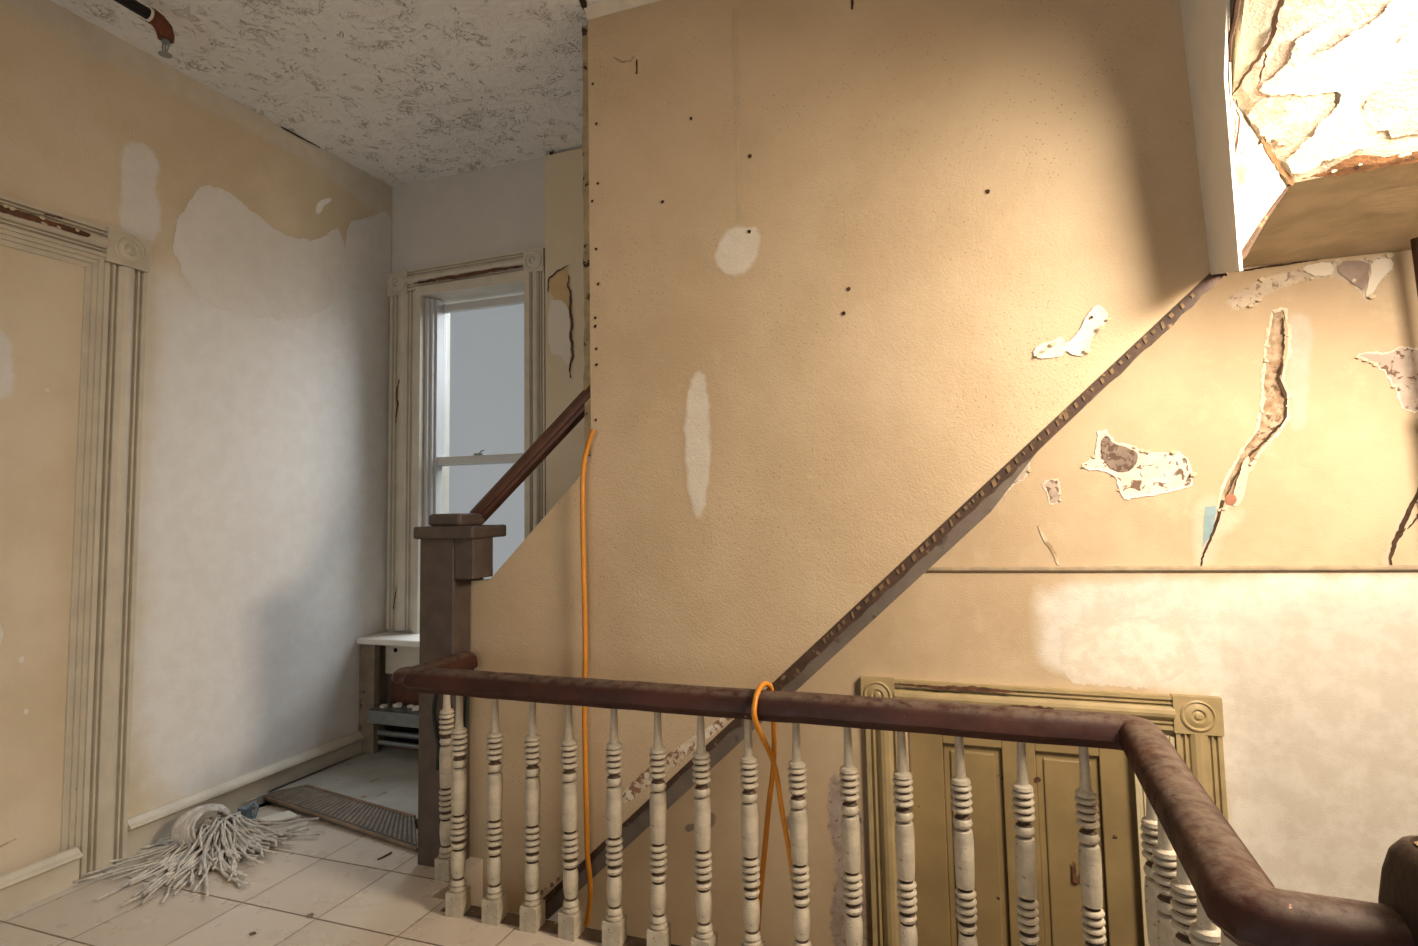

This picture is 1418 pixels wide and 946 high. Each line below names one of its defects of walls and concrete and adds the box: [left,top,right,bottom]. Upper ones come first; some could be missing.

peeling [1237,0,1418,205]
peeling [1225,253,1396,311]
peeling [1355,346,1418,414]
spalling [766,273,1224,691]
crack [1388,488,1418,565]
spalling [540,840,607,904]